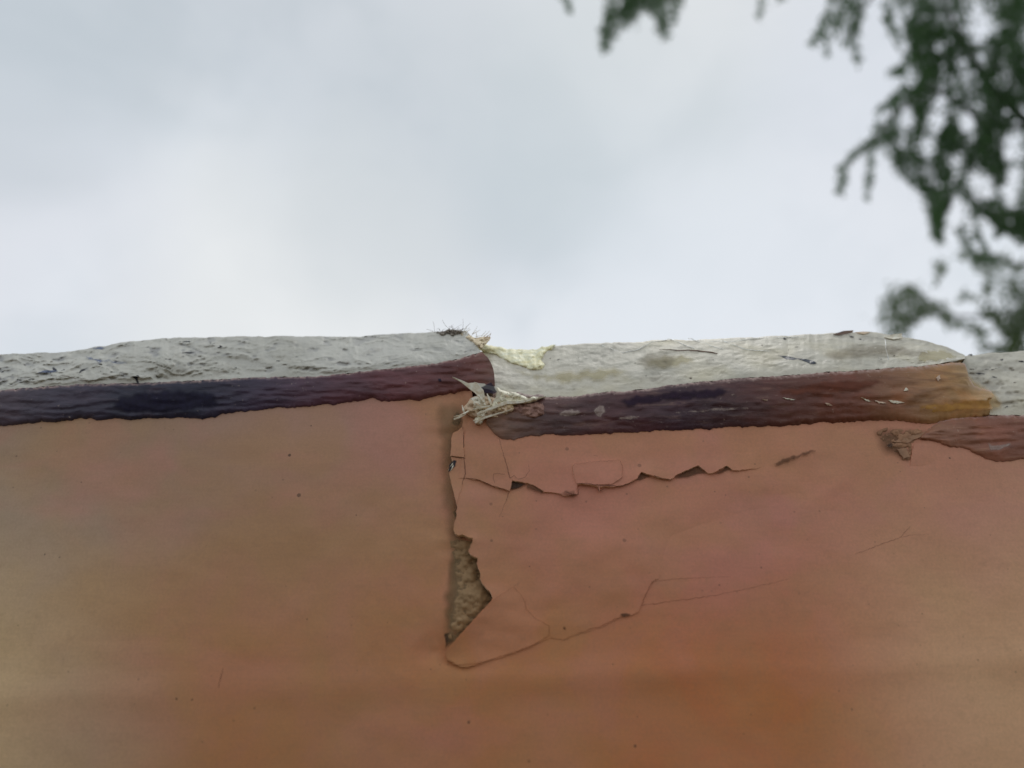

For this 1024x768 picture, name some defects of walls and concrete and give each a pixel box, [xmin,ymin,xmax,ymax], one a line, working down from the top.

peeling [0,352,1024,667]